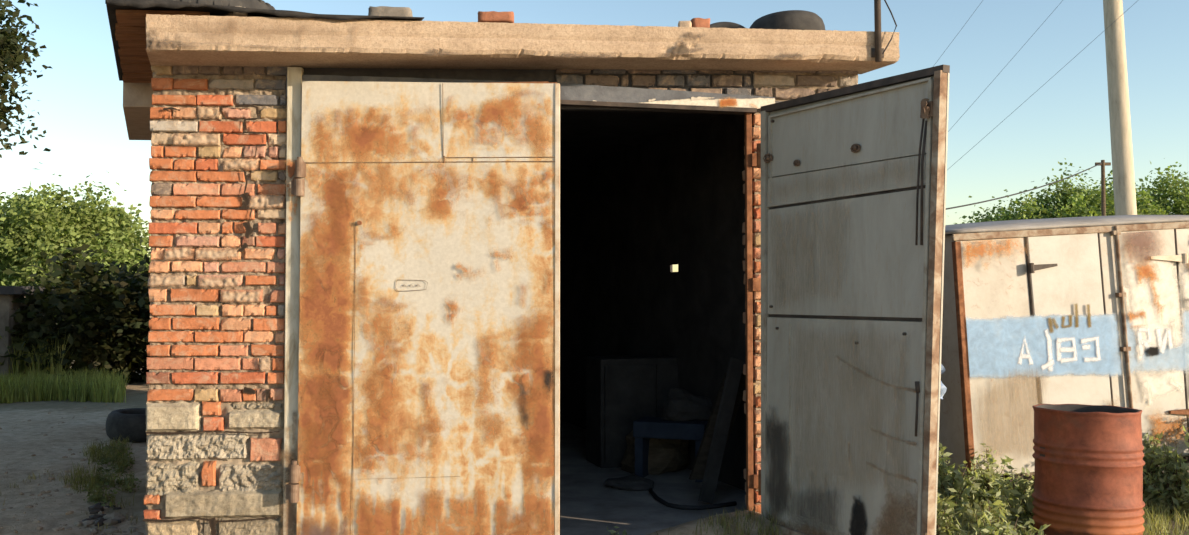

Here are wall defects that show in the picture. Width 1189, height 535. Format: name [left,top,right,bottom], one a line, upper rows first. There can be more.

corrosion [453,93,549,152]
corrosion [283,110,554,535]
damp [766,420,834,530]
damp [849,498,867,535]